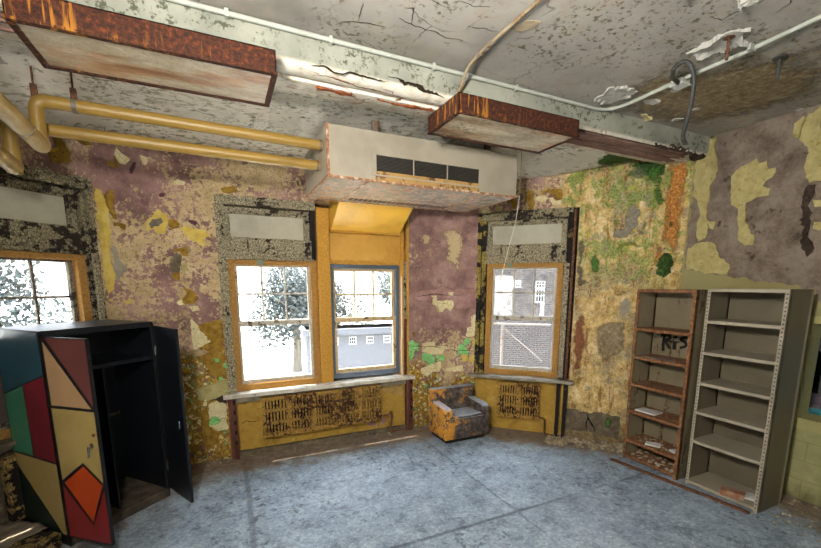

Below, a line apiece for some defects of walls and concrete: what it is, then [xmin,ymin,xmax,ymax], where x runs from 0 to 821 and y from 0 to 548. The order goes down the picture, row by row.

peeling [737,0,759,13]
peeling [686,27,751,60]
rust [316,86,353,97]
crack [312,65,444,101]
rust [377,99,434,112]
damp [625,53,821,124]
rust [648,162,687,273]
flaking render [655,104,821,303]
peeling [93,187,127,294]
peeling [441,229,466,271]
peeling [431,292,454,312]
peeling [409,314,476,377]